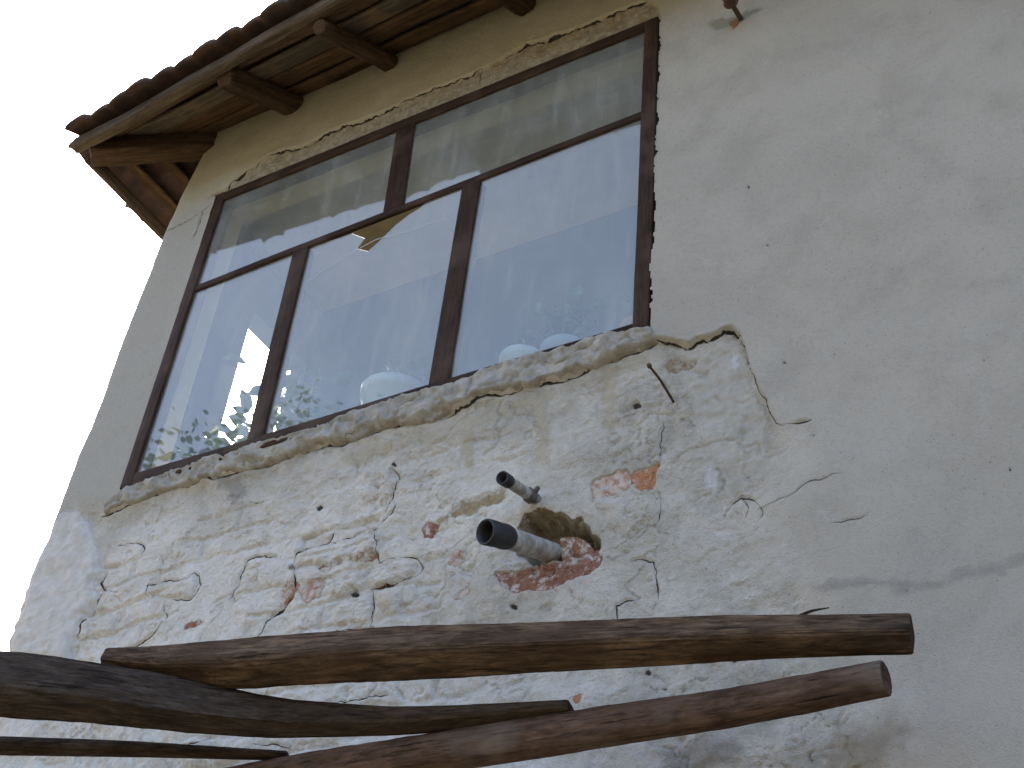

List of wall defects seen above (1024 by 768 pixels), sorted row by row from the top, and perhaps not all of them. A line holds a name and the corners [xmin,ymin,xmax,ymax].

crack [438,330,811,425]
spalling [666,360,696,373]
flaking render [591,463,660,502]
crack [729,473,834,519]
flaking render [422,522,440,539]
flaking render [356,547,379,563]
flaking render [448,550,467,567]
spalling [495,507,603,610]
peeling [11,512,100,659]
flaking render [282,560,341,605]